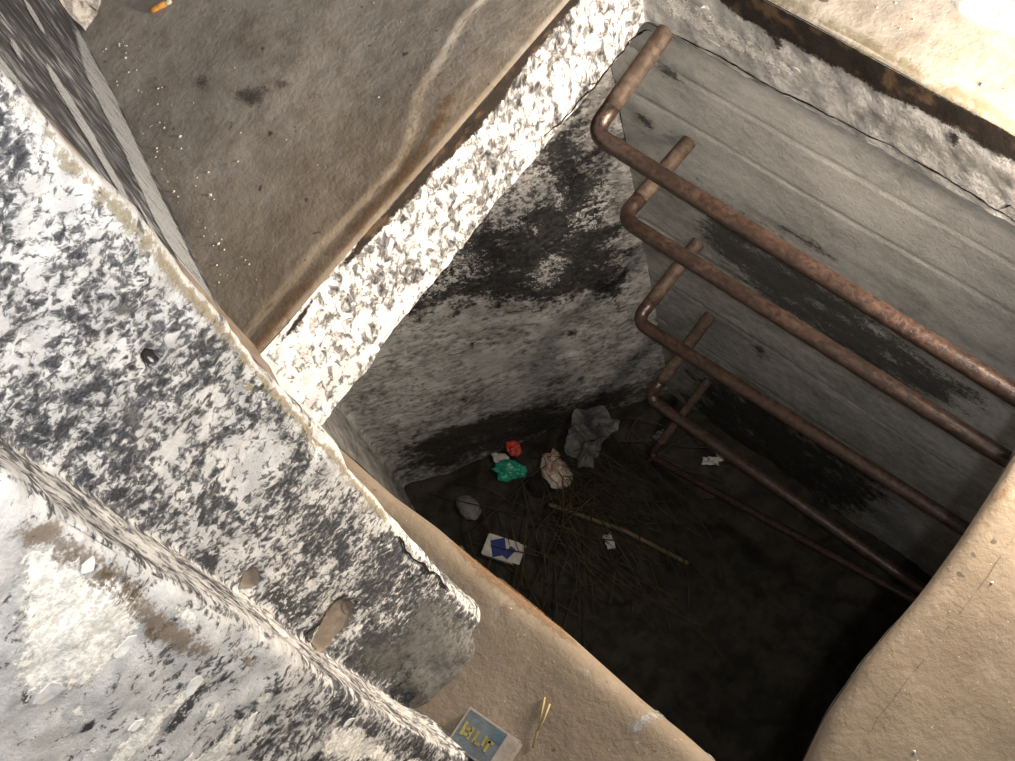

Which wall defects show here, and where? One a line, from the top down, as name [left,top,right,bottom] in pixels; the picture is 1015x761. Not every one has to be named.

leakage [344,0,580,264]
crack [543,26,1015,222]
leakage [284,299,313,339]
peeling [192,546,221,574]
peeling [240,567,301,635]
spalling [312,598,354,653]